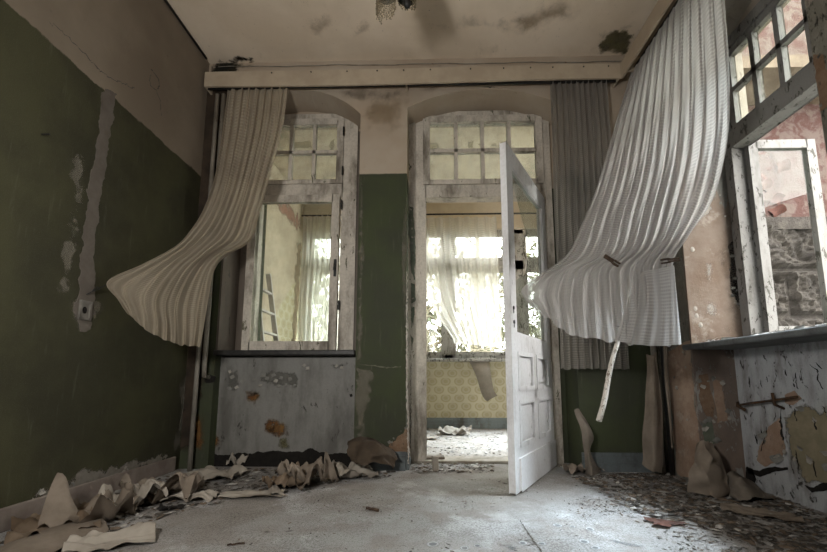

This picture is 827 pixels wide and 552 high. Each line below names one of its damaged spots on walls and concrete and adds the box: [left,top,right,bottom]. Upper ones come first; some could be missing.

peeling [69,154,83,202]
peeling [715,164,728,217]
peeling [60,241,76,291]
peeling [728,241,740,310]
corrosion [265,420,289,448]
flaking render [668,340,732,477]
flaking render [746,391,827,492]